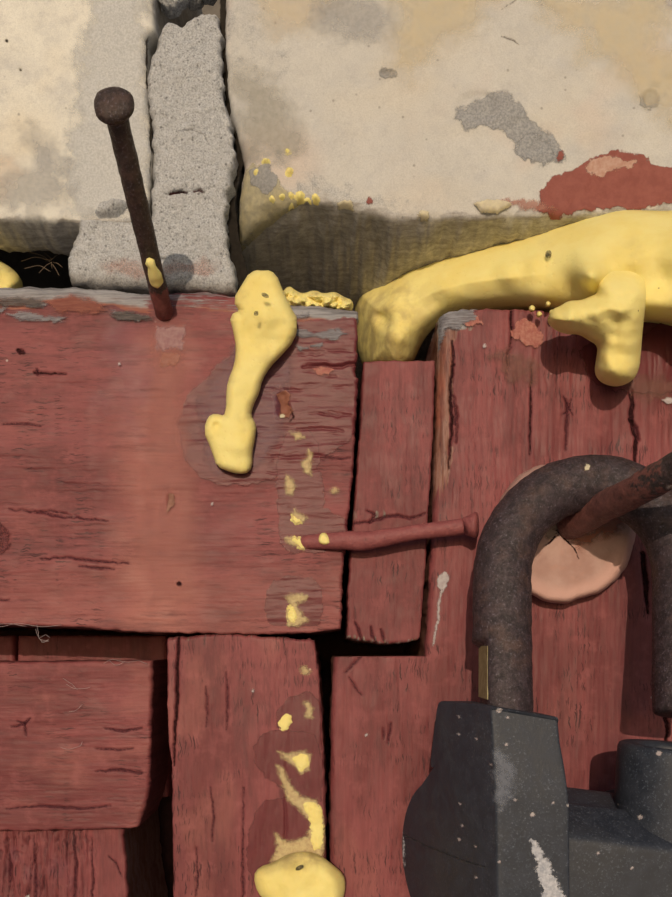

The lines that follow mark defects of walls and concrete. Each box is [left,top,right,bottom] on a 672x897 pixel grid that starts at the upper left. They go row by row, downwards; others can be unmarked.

spalling [455,92,566,166]
peeling [586,156,637,177]
peeling [0,295,153,323]
peeling [510,318,544,348]
water stain [177,317,358,554]
crack [448,340,458,468]
crack [628,392,639,462]
water stain [264,576,323,627]
water stain [246,691,323,886]